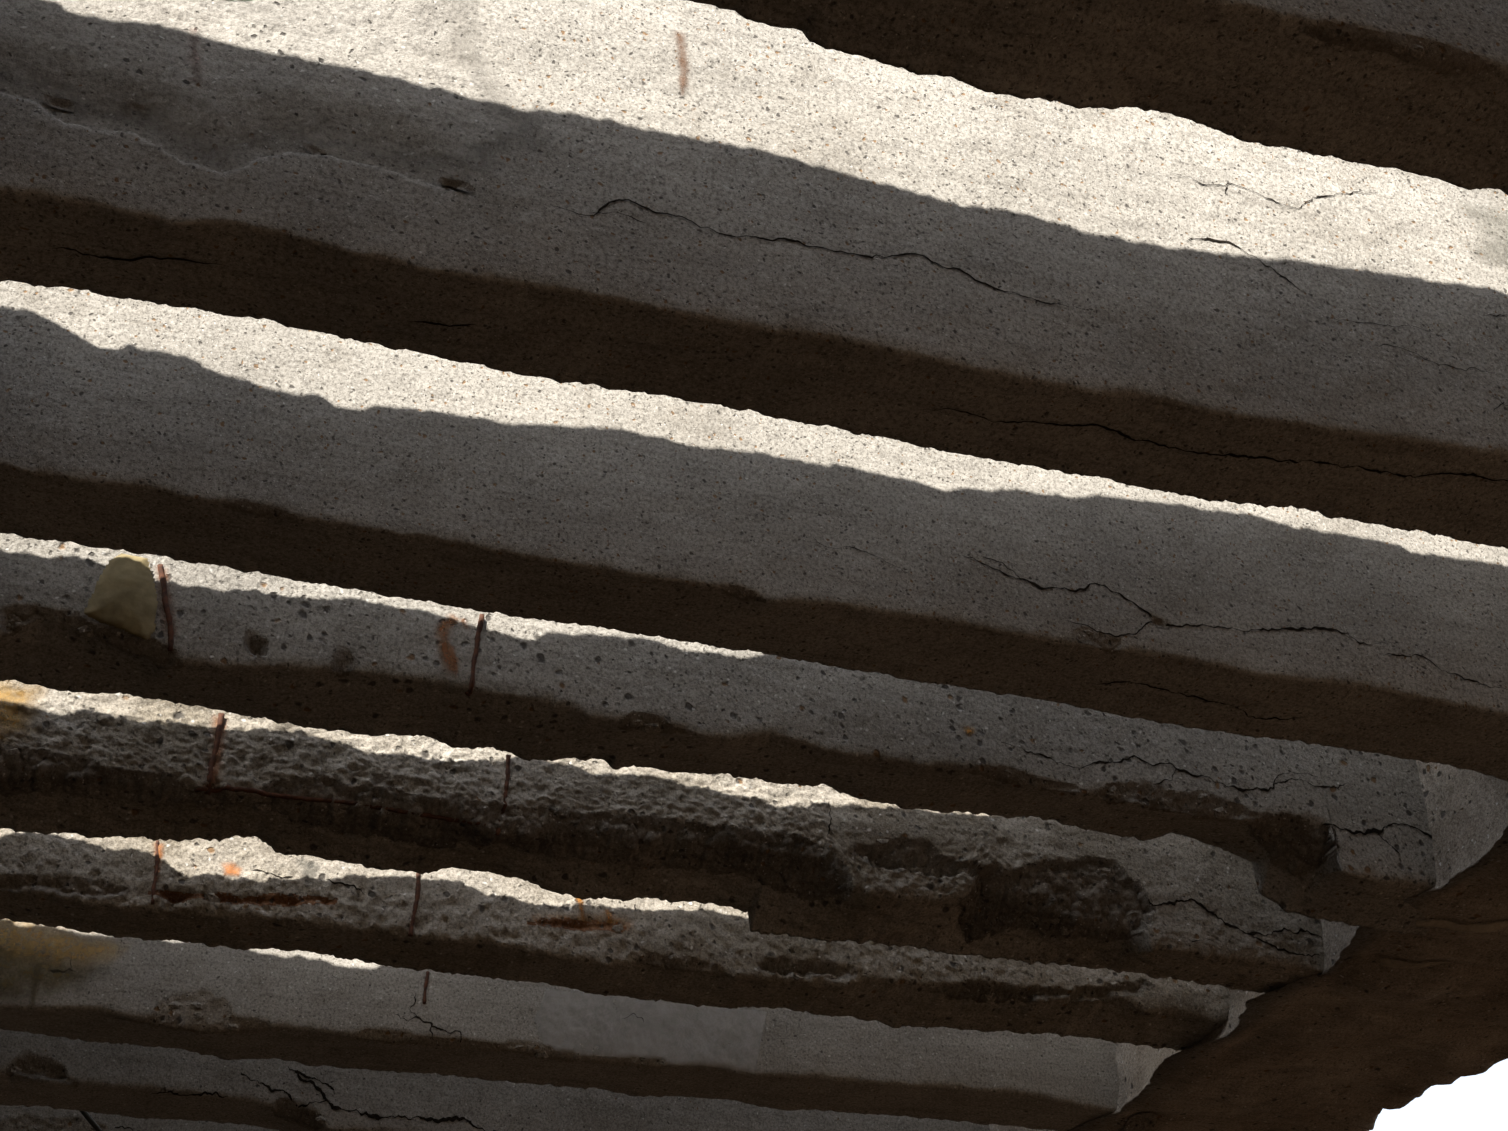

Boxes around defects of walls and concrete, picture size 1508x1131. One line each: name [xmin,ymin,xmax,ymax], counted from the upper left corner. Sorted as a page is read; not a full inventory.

crack [552,199,1081,309]
crack [1183,237,1300,290]
crack [1336,319,1508,410]
corrosion [438,618,467,670]
crack [957,554,1508,690]
crack [1088,681,1306,720]
spalling [0,710,1156,944]
crack [1001,742,1432,854]
spalling [636,951,718,973]
spalling [757,955,857,982]
crack [150,1067,496,1131]